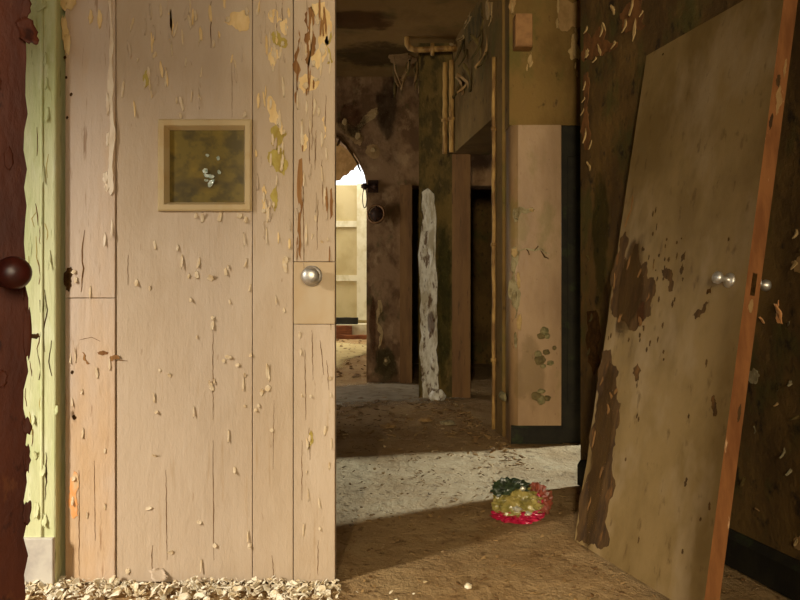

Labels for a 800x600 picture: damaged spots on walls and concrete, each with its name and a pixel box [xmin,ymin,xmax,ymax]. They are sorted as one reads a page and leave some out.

peeling [15,0,47,45]
peeling [610,0,646,42]
peeling [88,1,125,195]
peeling [556,0,618,150]
peeling [223,0,334,273]
peeling [202,168,221,187]
peeling [18,287,40,361]
peeling [63,267,78,292]
peeling [418,188,439,398]
peeling [21,415,46,477]
peeling [22,500,47,528]
peeling [68,471,88,519]